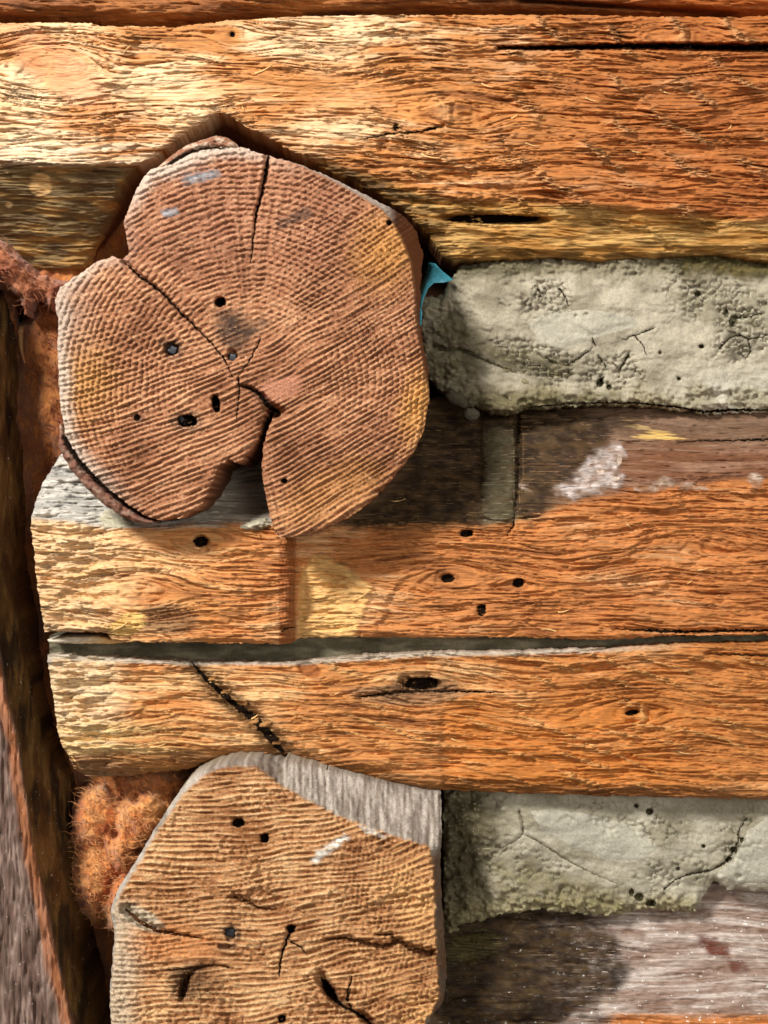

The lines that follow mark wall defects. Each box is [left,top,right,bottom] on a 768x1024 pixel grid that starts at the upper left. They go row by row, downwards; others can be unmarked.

crack [497,43,768,51]
crack [167,146,226,166]
crack [250,155,270,262]
crack [125,262,279,421]
water stain [354,394,631,528]
crack [665,818,747,888]
crack [125,909,202,939]
crack [279,927,308,975]